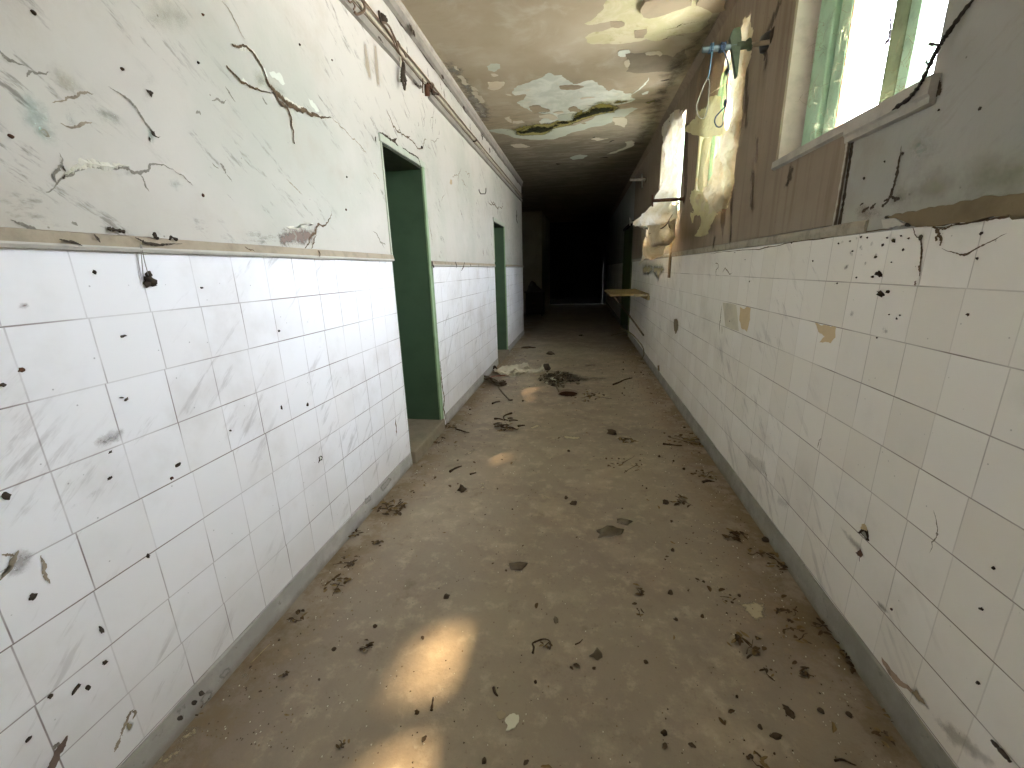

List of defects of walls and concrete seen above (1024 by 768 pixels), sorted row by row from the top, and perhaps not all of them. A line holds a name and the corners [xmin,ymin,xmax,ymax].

crack [39,88,191,193]
crack [196,7,518,183]
peeling [454,63,648,148]
crack [935,79,943,97]
crack [716,142,1007,285]
spalling [881,193,1024,228]
peeling [723,303,751,331]
peeling [815,323,836,343]